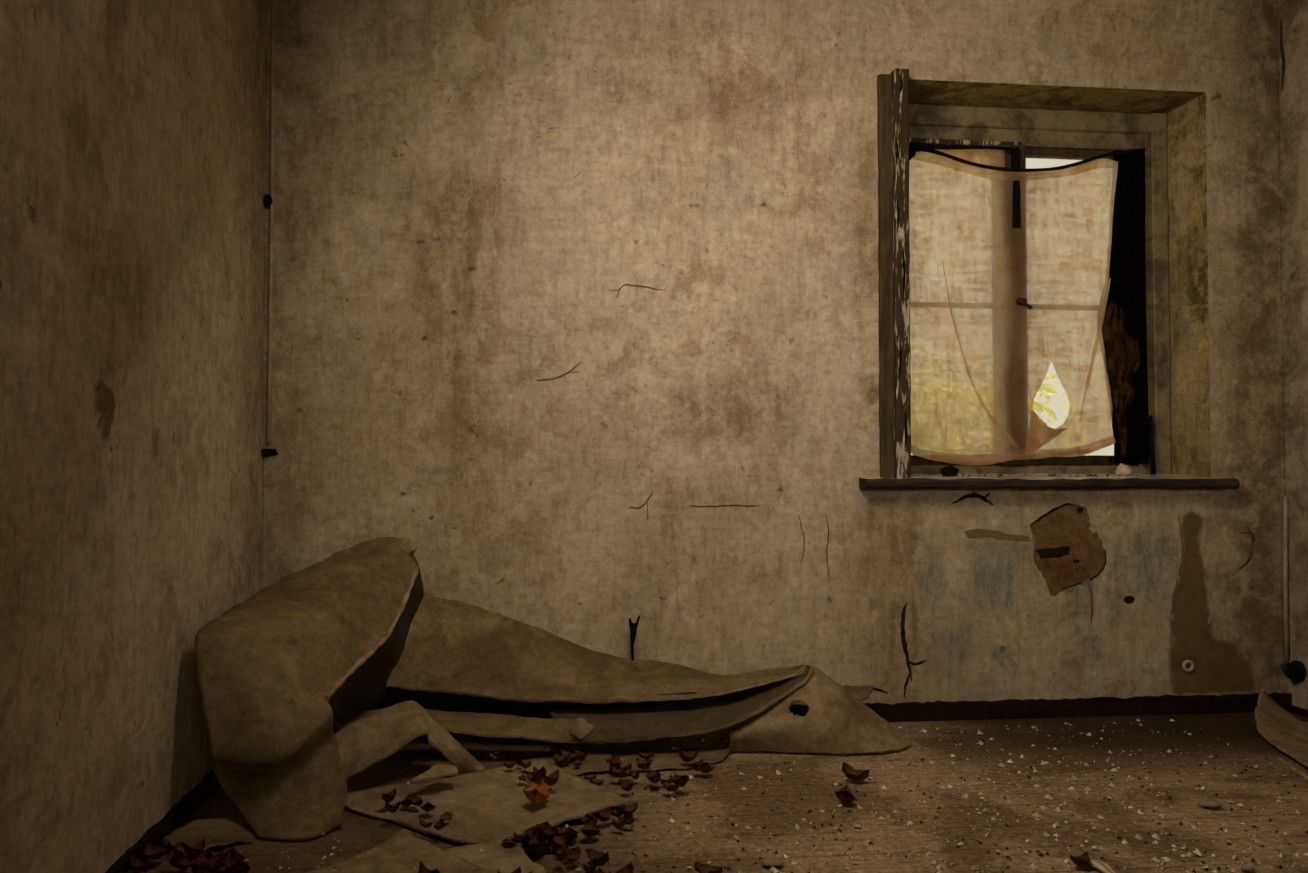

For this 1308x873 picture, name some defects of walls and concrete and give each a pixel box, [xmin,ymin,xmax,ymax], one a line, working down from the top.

water stain [1229,0,1302,677]
spalling [965,503,1116,596]
crack [873,603,927,698]